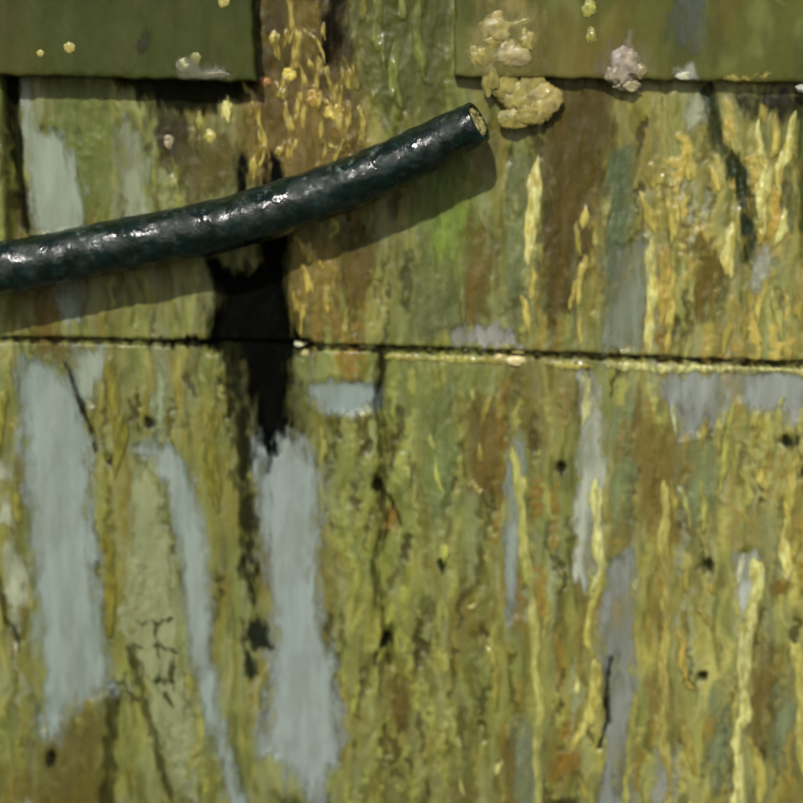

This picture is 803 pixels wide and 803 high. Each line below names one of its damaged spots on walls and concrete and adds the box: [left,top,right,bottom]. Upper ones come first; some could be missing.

spalling [675,63,697,81]
spalling [711,73,770,83]
damp [150,236,353,605]
peeling [661,362,720,443]
peeling [743,366,803,426]
spalling [779,435,799,447]
peeling [0,500,12,525]
peeling [3,344,118,739]
peeling [126,442,246,803]
peeling [251,431,346,803]